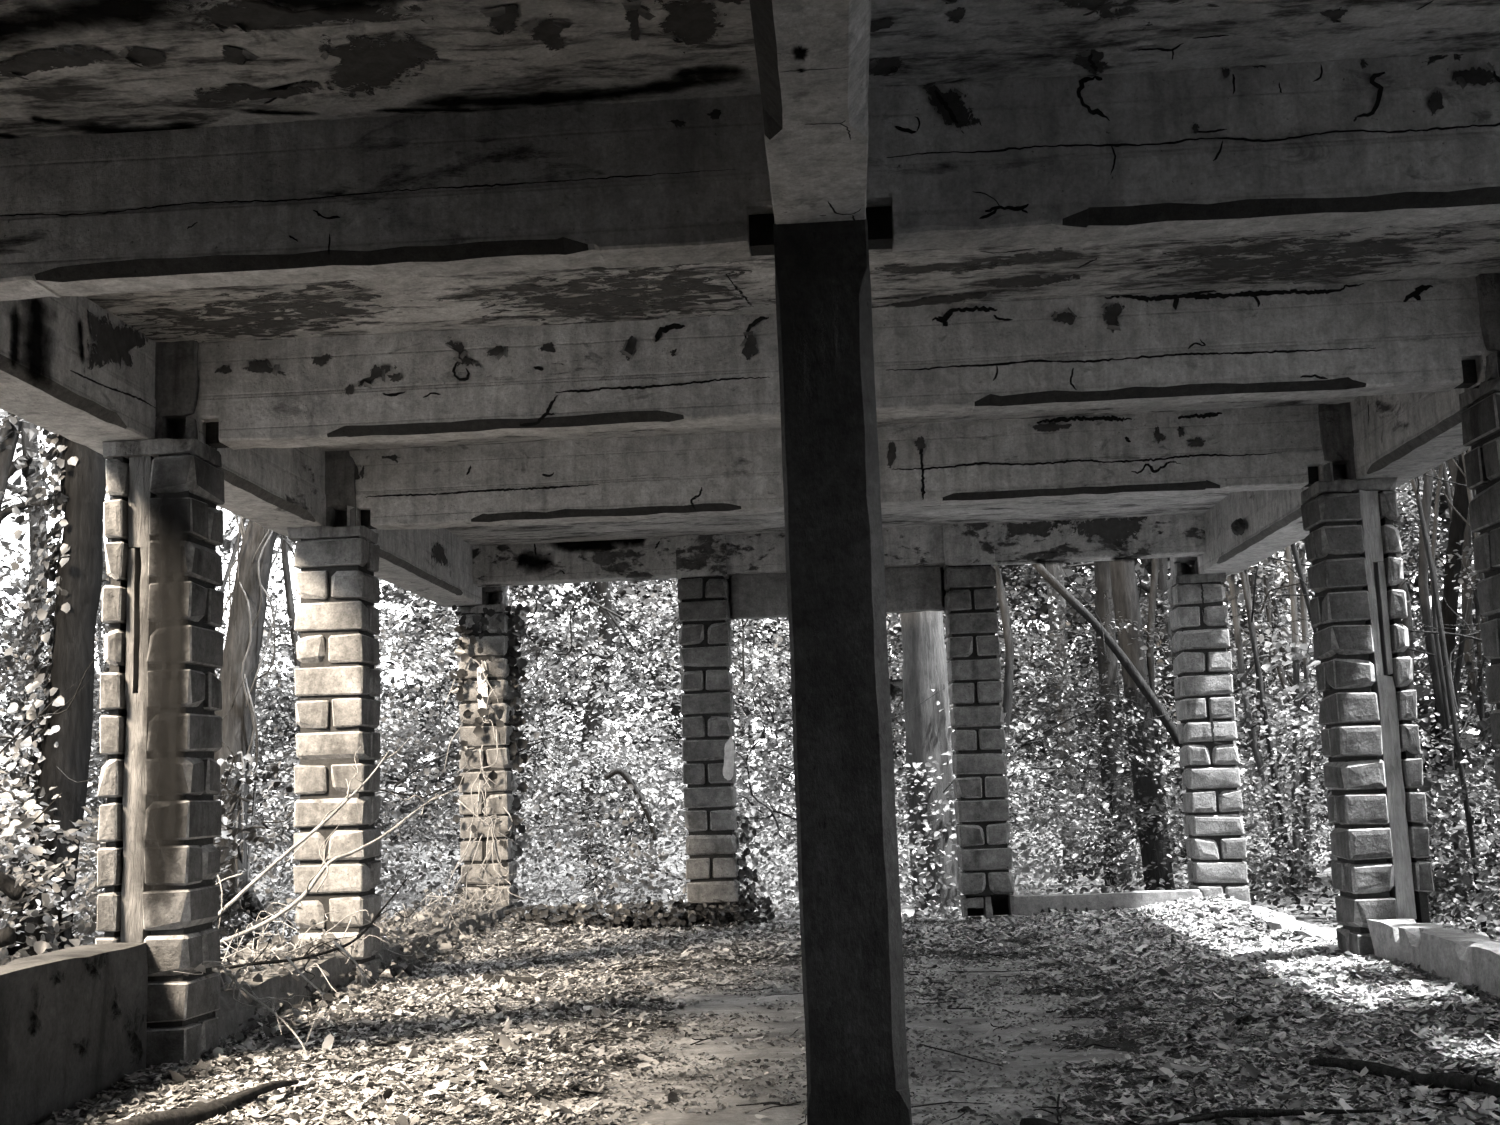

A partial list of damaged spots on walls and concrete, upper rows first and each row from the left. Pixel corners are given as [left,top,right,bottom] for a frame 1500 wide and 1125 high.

crack [1138,35,1229,59]
crack [887,59,1500,175]
crack [805,121,851,140]
crack [821,202,861,220]
crack [975,192,1035,254]
crack [1105,283,1364,310]
crack [1403,285,1433,302]
crack [932,306,1013,326]
crack [655,323,685,342]
crack [520,366,770,427]
crack [889,339,1374,499]